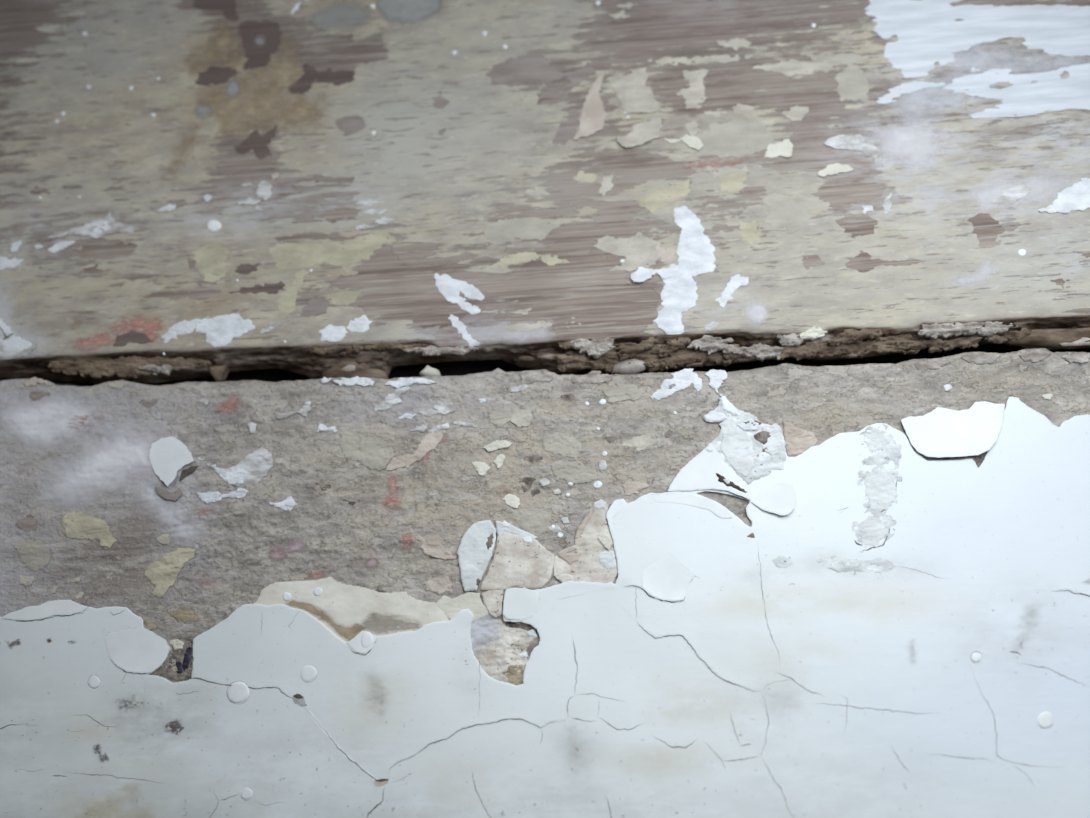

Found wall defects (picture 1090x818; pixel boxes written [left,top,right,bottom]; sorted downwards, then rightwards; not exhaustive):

peeling [192,0,283,87]
peeling [288,34,389,94]
peeling [273,206,364,243]
peeling [811,163,886,238]
peeling [967,213,1006,248]
peeling [0,232,1090,818]
crack [854,510,950,579]
crack [18,608,127,622]
crack [173,542,939,818]
crack [1010,651,1090,687]
crack [933,664,1064,785]
crack [13,768,161,783]